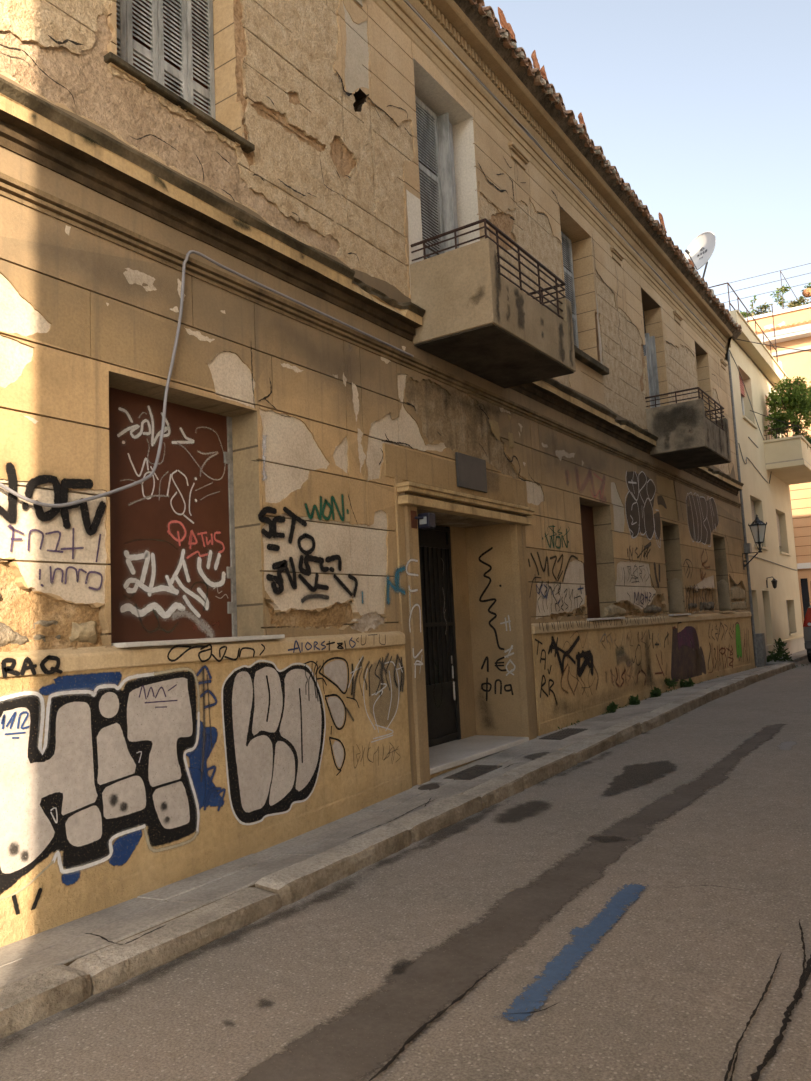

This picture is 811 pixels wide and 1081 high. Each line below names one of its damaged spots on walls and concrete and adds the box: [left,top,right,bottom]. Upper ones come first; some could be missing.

flaking render [0,0,414,298]
flaking render [0,274,51,388]
peeling [184,327,215,342]
flaking render [0,479,107,652]
flaking render [207,351,544,632]